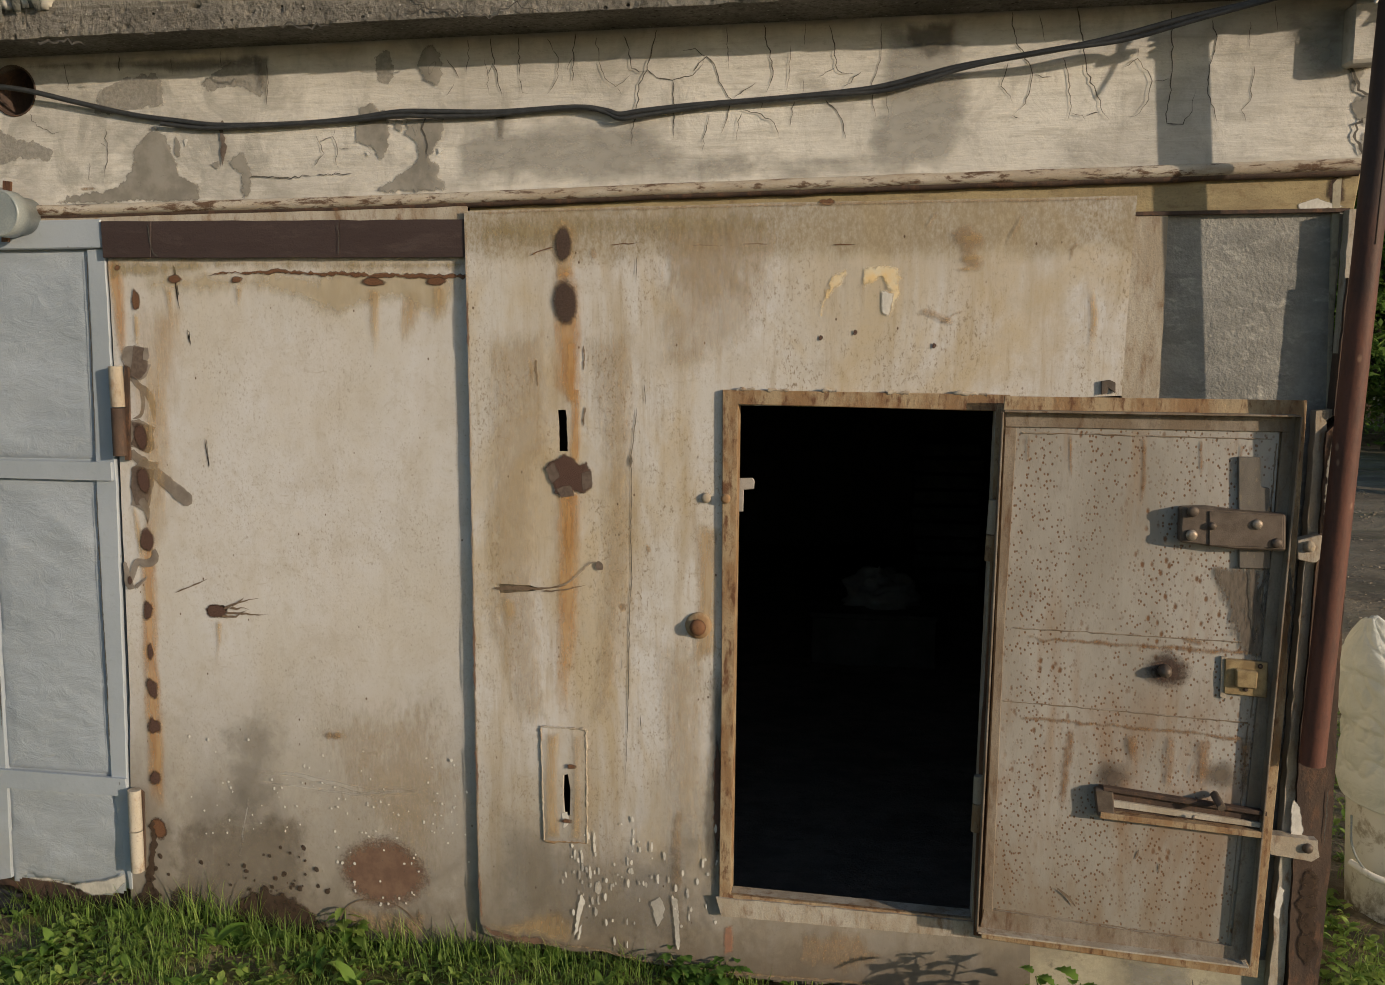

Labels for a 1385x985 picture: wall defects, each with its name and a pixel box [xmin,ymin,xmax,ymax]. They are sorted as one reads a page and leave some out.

peeling [95,73,163,115]
crack [407,0,889,149]
crack [1001,6,1278,125]
peeling [0,130,53,165]
peeling [63,128,199,204]
peeling [355,103,445,193]
rust [41,170,1360,219]
rust [546,227,592,670]
rust [110,235,470,789]
damp [170,888,206,920]
damp [228,845,331,936]
rust [336,830,428,934]